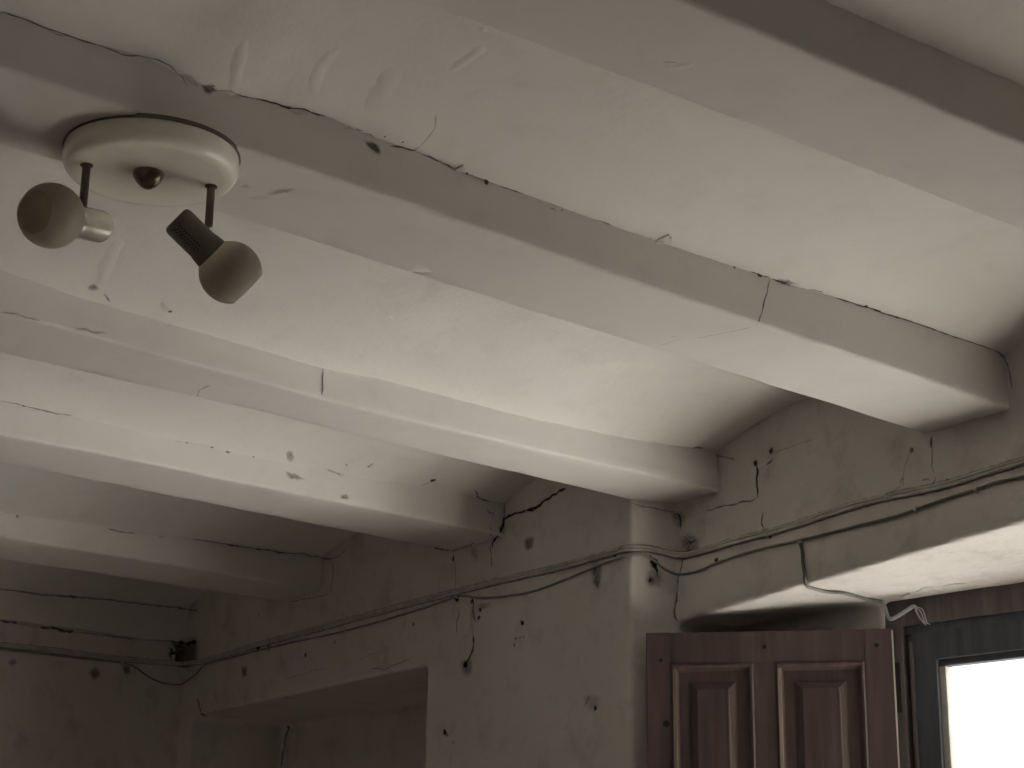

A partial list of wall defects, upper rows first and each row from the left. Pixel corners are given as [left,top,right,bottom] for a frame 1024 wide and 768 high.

crack [4,12,175,70]
crack [220,90,324,116]
crack [348,127,522,194]
crack [700,272,770,338]
crack [837,298,1012,387]
crack [434,488,566,566]
crack [710,448,773,539]
crack [2,589,197,611]
crack [463,598,484,672]